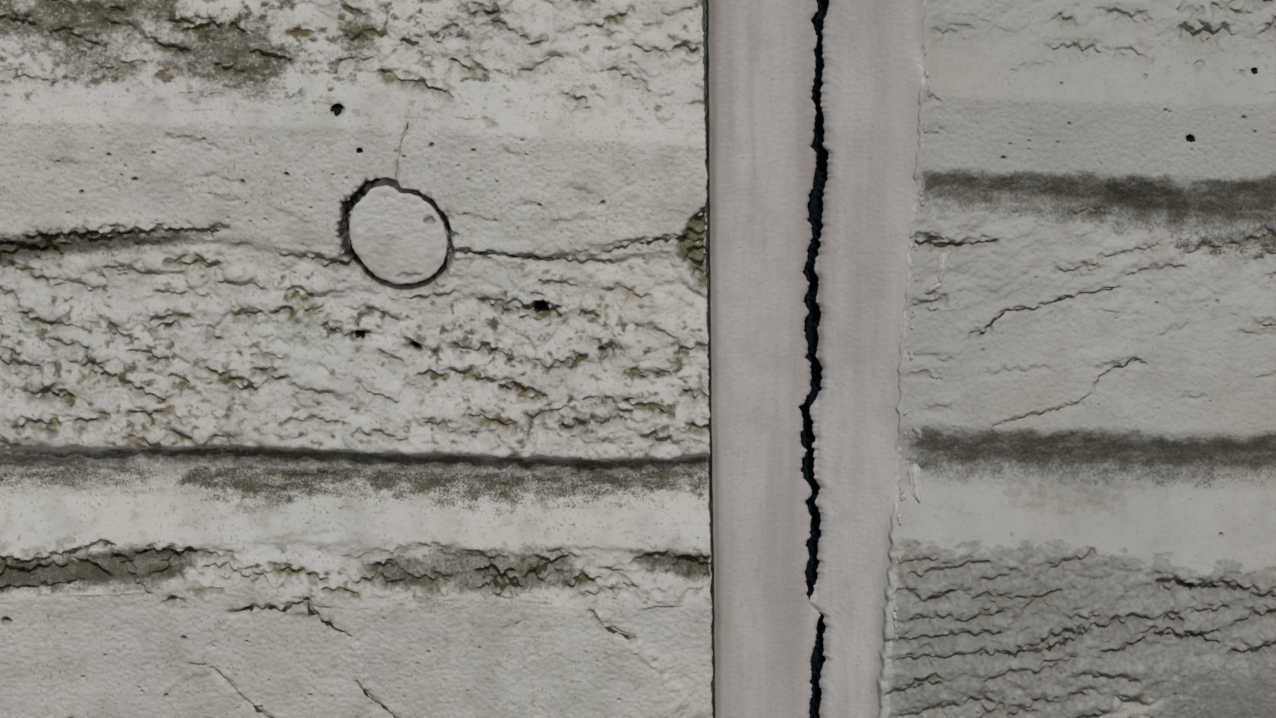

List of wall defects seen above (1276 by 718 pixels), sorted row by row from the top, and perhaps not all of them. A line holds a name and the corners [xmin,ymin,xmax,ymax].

water stain [926,174,1276,255]
crack [980,287,1115,335]
crack [337,0,715,718]
crack [799,0,829,718]
crack [999,359,1137,424]
water stain [0,448,707,512]
water stain [911,430,1276,486]
crack [237,602,344,632]
crack [202,663,273,718]